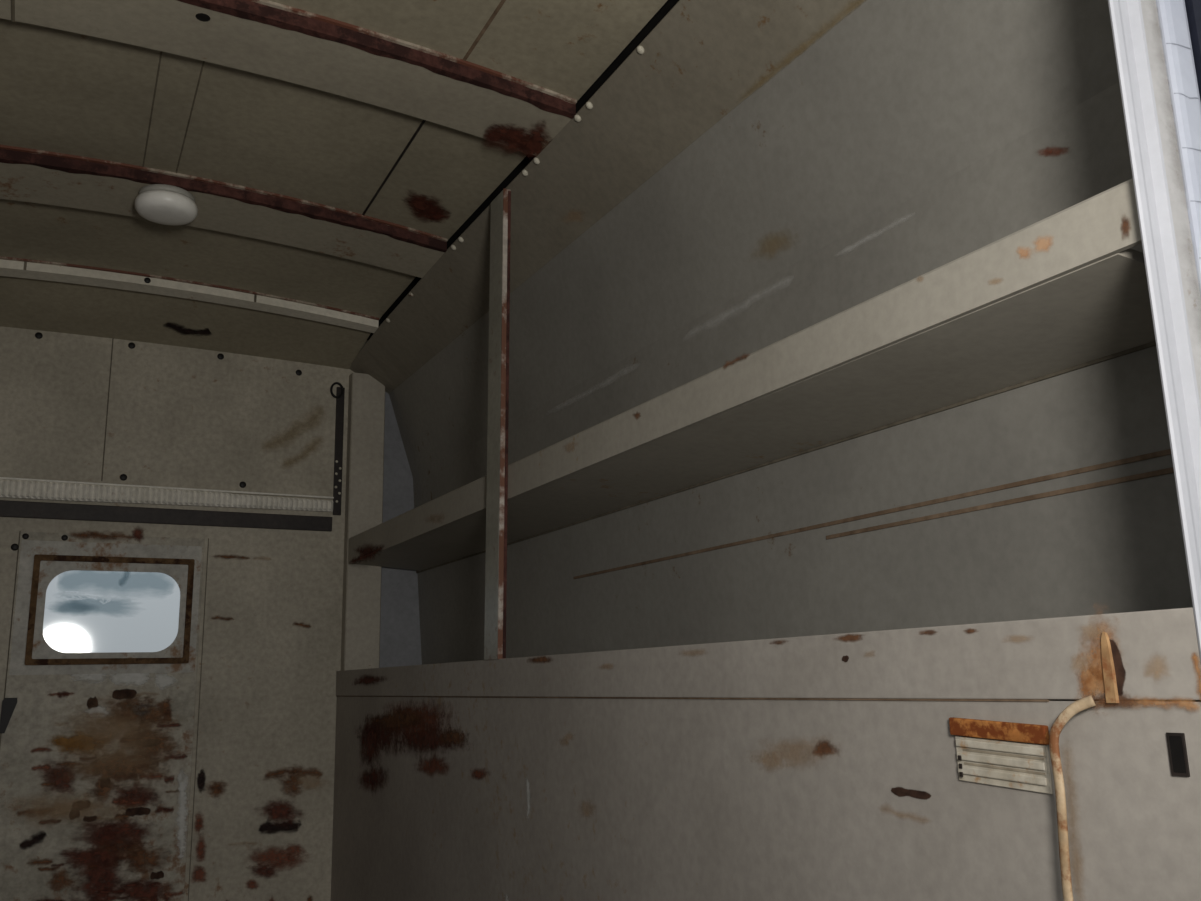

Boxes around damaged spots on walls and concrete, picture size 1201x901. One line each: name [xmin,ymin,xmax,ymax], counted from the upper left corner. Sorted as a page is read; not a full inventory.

rust [178,0,576,157]
rust [0,149,449,252]
rust [497,188,511,659]
rust [839,634,861,662]
rust [1080,627,1201,709]
rust [361,701,464,791]
rust [814,742,836,755]
rust [949,717,1049,745]
rust [17,689,187,901]
rust [192,816,205,882]
rust [247,768,322,889]